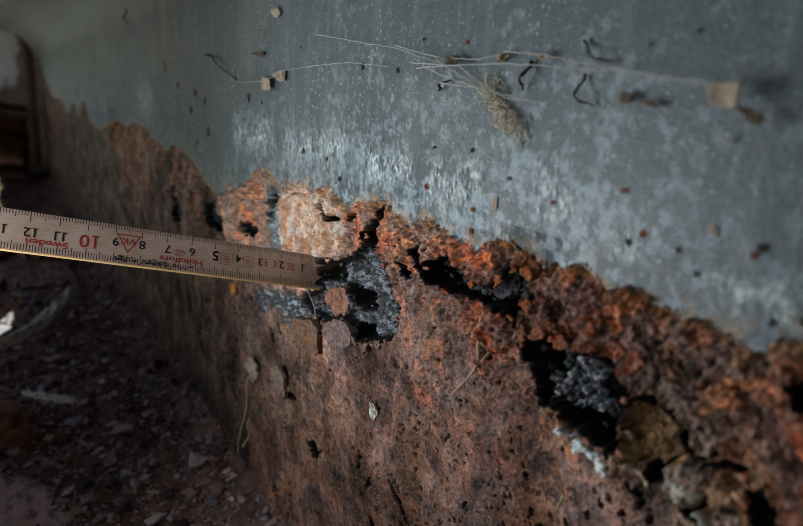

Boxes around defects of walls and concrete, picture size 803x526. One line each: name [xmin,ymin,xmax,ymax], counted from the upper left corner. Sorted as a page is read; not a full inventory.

spalling [267,189,282,249]
rust [383,200,504,261]
peeling [493,264,535,289]
spalling [244,285,321,327]
rust [288,285,359,359]
rust [543,261,803,363]
rust [244,355,260,383]
rust [269,364,288,398]
rust [369,401,379,421]
spalling [582,396,685,479]
rust [189,452,211,467]
rust [144,513,166,526]